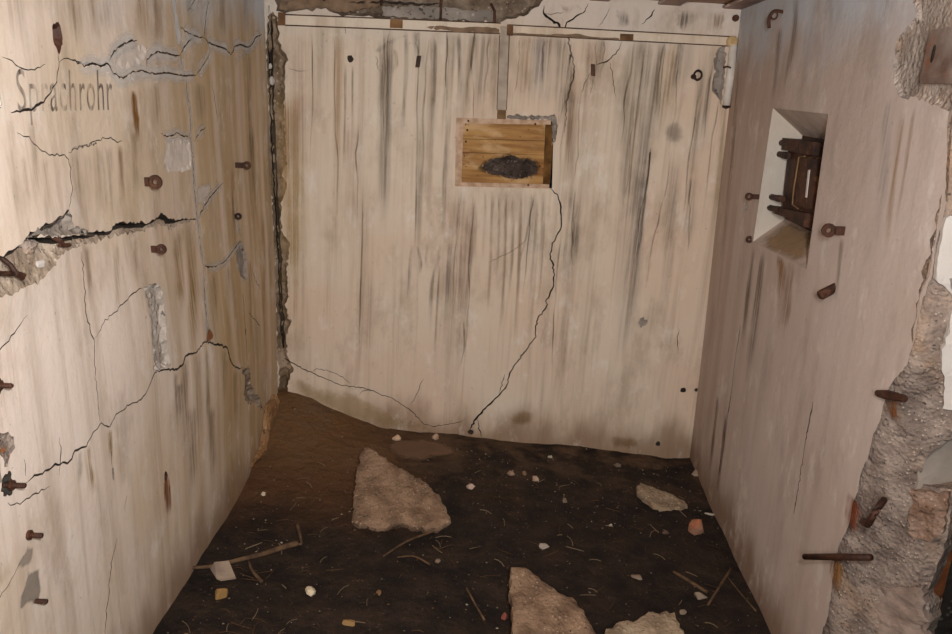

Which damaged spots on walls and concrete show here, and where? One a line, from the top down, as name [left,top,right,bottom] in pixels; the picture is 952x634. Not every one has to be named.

flaking render [893,0,952,111]
flaking render [164,137,192,173]
flaking render [266,0,543,391]
crack [0,0,562,506]
flaking render [143,283,171,372]
spalling [907,488,952,542]